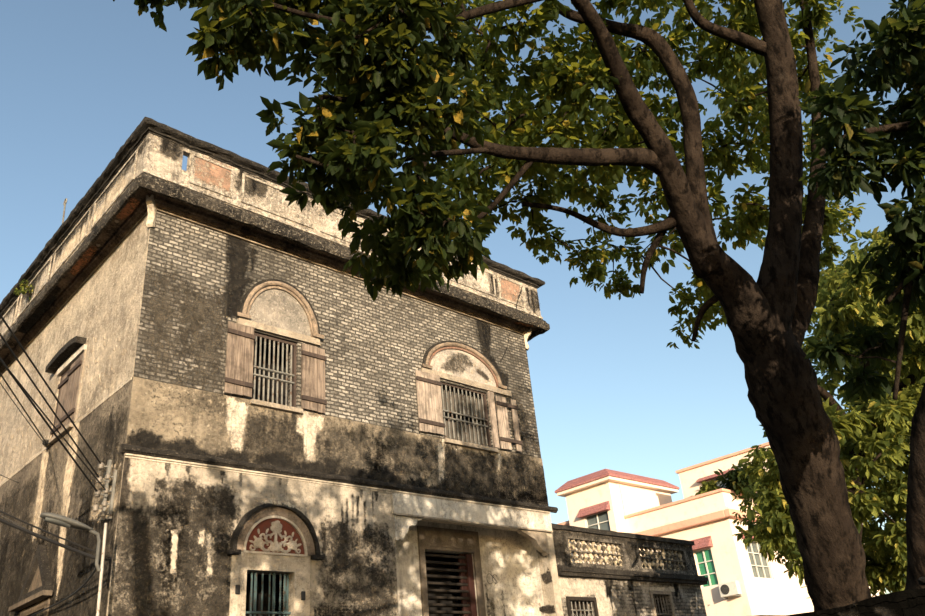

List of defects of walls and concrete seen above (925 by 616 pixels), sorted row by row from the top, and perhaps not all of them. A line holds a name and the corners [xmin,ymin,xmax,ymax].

damp [0,235,549,616]